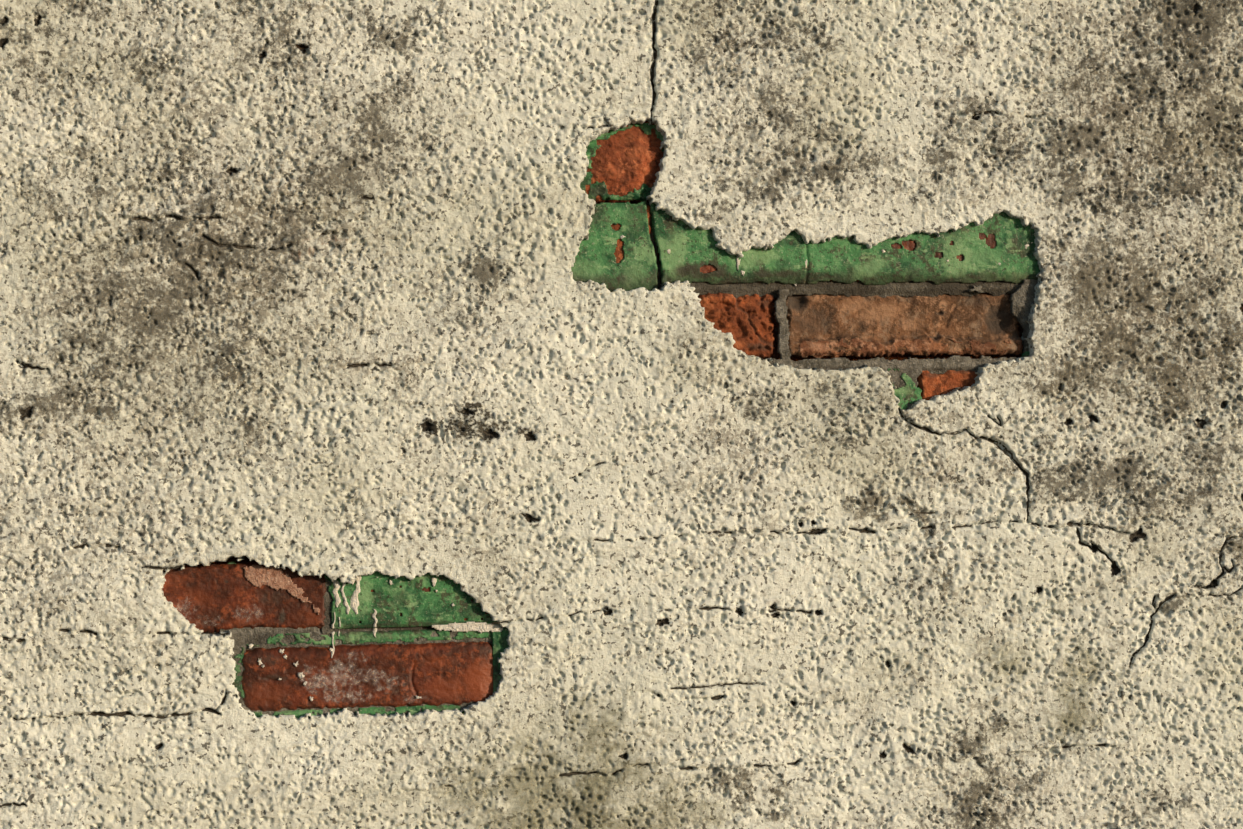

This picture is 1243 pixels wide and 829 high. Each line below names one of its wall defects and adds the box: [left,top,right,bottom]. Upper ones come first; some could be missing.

crack [650,0,658,125]
spalling [571,121,1040,410]
spalling [162,561,509,719]
crack [1129,537,1242,667]
crack [13,693,227,720]